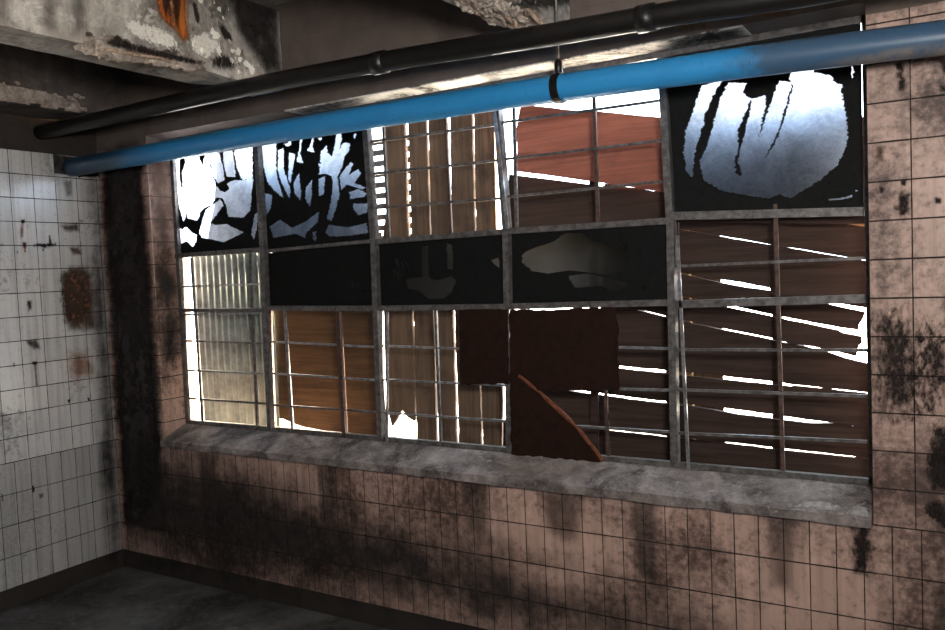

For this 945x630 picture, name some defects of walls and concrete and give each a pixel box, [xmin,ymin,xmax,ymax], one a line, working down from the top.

spalling [73,26,207,72]
corrosion [158,0,189,40]
peeling [198,0,261,75]
leakage [894,180,909,215]
leakage [60,268,94,329]
leakage [926,427,945,528]